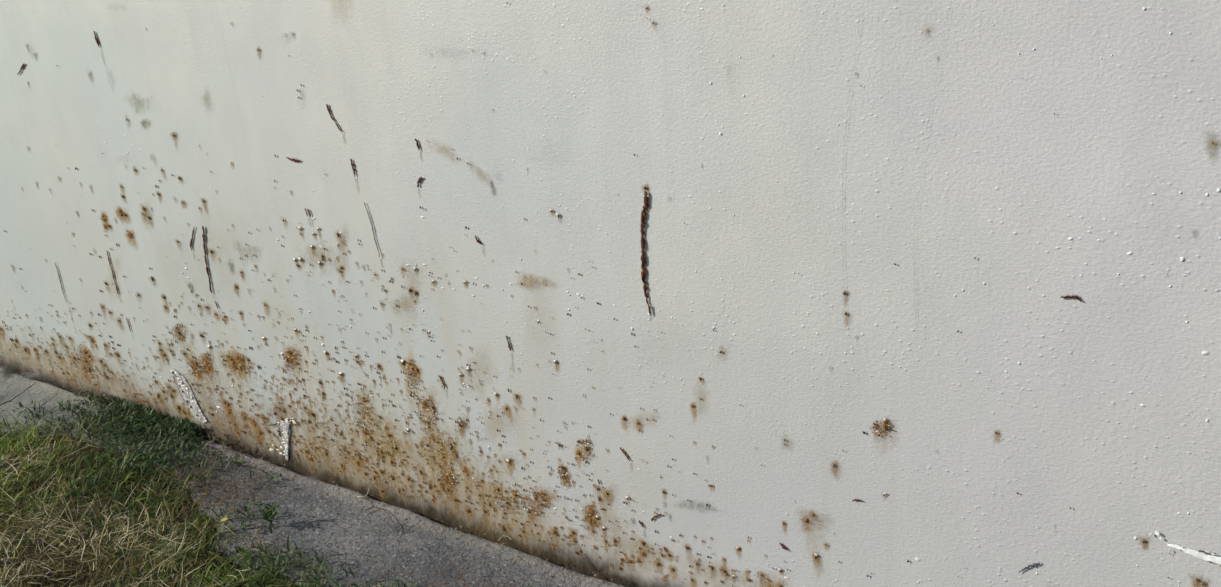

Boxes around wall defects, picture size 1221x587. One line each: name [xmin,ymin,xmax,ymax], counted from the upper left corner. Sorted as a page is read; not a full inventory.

corrosion [863,418,893,437]
peeling [1149,532,1221,566]